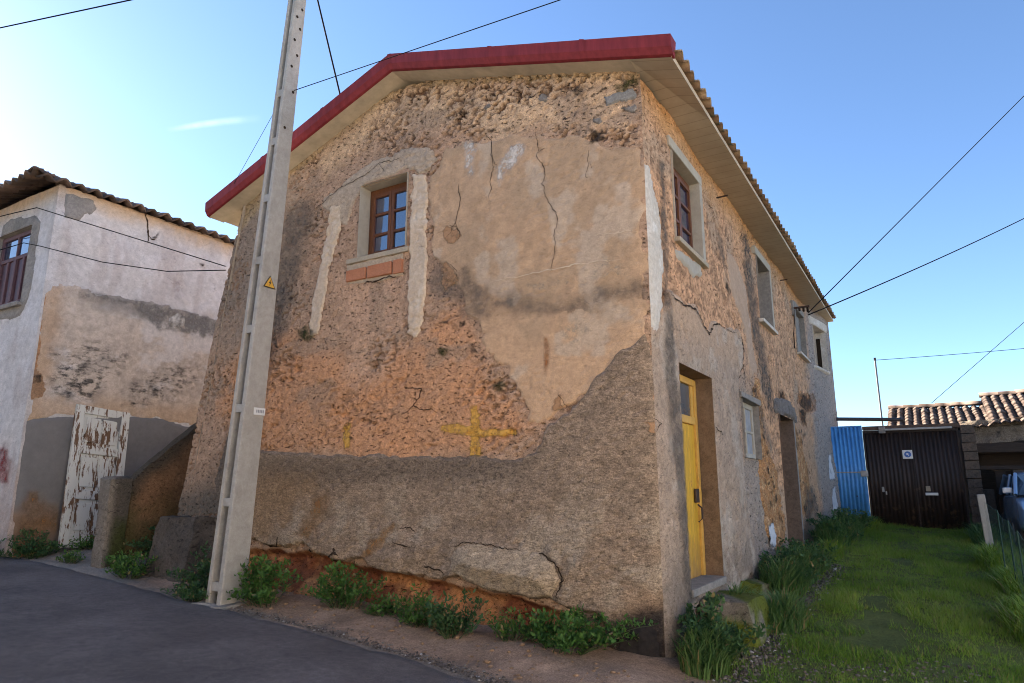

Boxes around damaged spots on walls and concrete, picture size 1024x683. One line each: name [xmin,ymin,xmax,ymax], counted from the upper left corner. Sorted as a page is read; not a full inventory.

crack [535,134,558,271]
leakage [53,346,126,397]
leakage [136,302,215,337]
peeling [309,206,341,336]
peeling [407,76,786,658]
crack [673,295,746,392]
spalling [780,393,816,519]
crack [451,541,564,601]